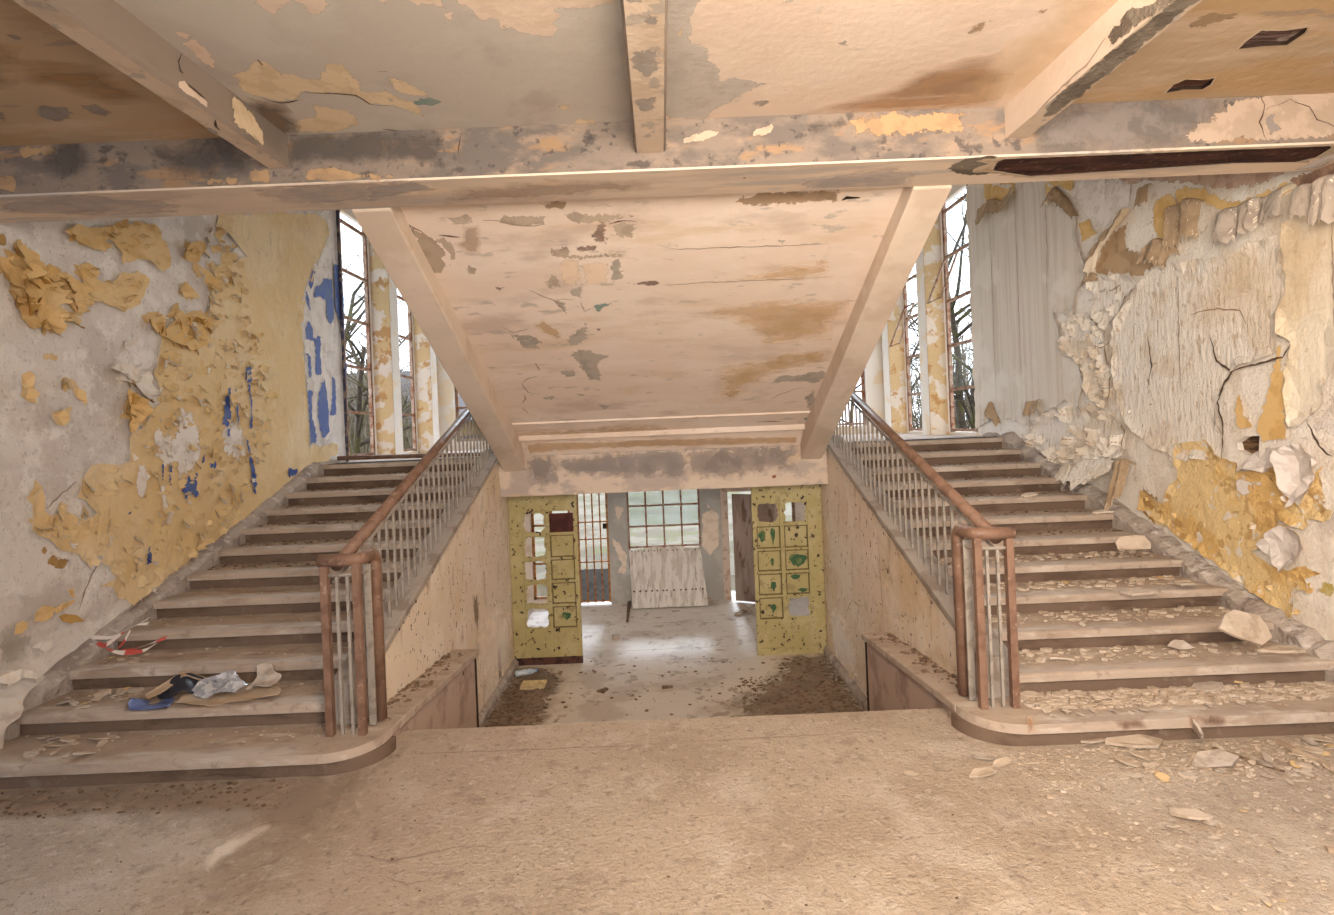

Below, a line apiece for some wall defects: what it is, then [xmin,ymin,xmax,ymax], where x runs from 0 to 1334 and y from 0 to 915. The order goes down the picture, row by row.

peeling [38,104,109,121]
peeling [178,81,208,107]
peeling [232,61,441,145]
peeling [409,0,769,143]
damp [852,66,998,108]
crack [1259,97,1333,141]
peeling [949,0,1334,655]
peeling [0,159,428,605]
crack [1147,288,1290,458]
flaking render [1167,640,1211,661]
peeling [0,669,45,750]